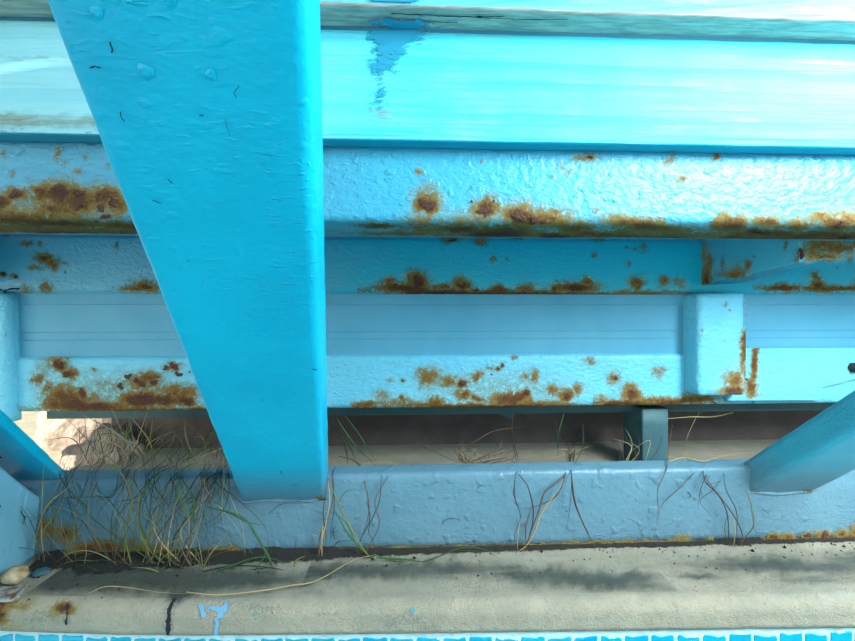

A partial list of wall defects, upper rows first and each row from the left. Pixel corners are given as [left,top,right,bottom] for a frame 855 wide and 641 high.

corrosion [0,169,138,273]
corrosion [353,185,855,285]
corrosion [120,279,159,294]
corrosion [357,269,687,295]
corrosion [757,272,855,293]
corrosion [28,356,207,412]
corrosion [350,355,583,408]
corrosion [590,329,760,406]
corrosion [763,525,855,540]
water stain [521,568,645,589]
water stain [723,557,855,571]
crack [165,598,177,636]